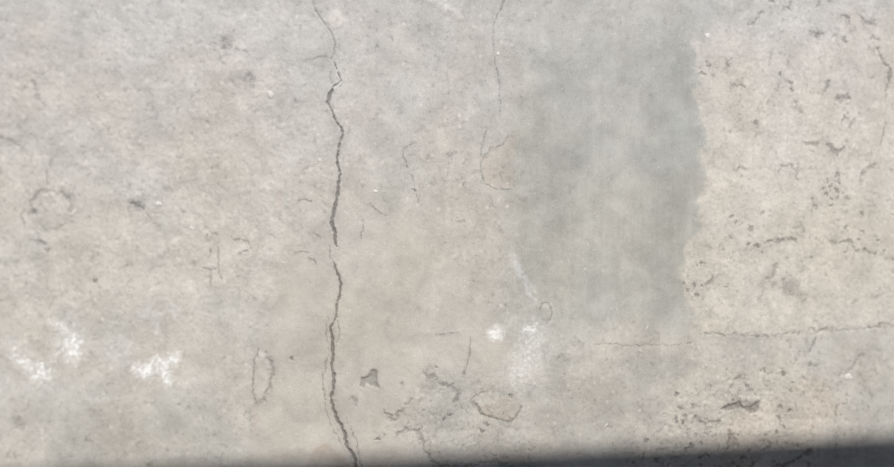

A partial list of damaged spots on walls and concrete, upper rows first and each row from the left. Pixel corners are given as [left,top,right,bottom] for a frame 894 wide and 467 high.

crack [492,0,507,121]
crack [294,0,387,467]
water stain [482,0,732,467]
flaking render [372,331,543,467]
crack [595,319,894,354]